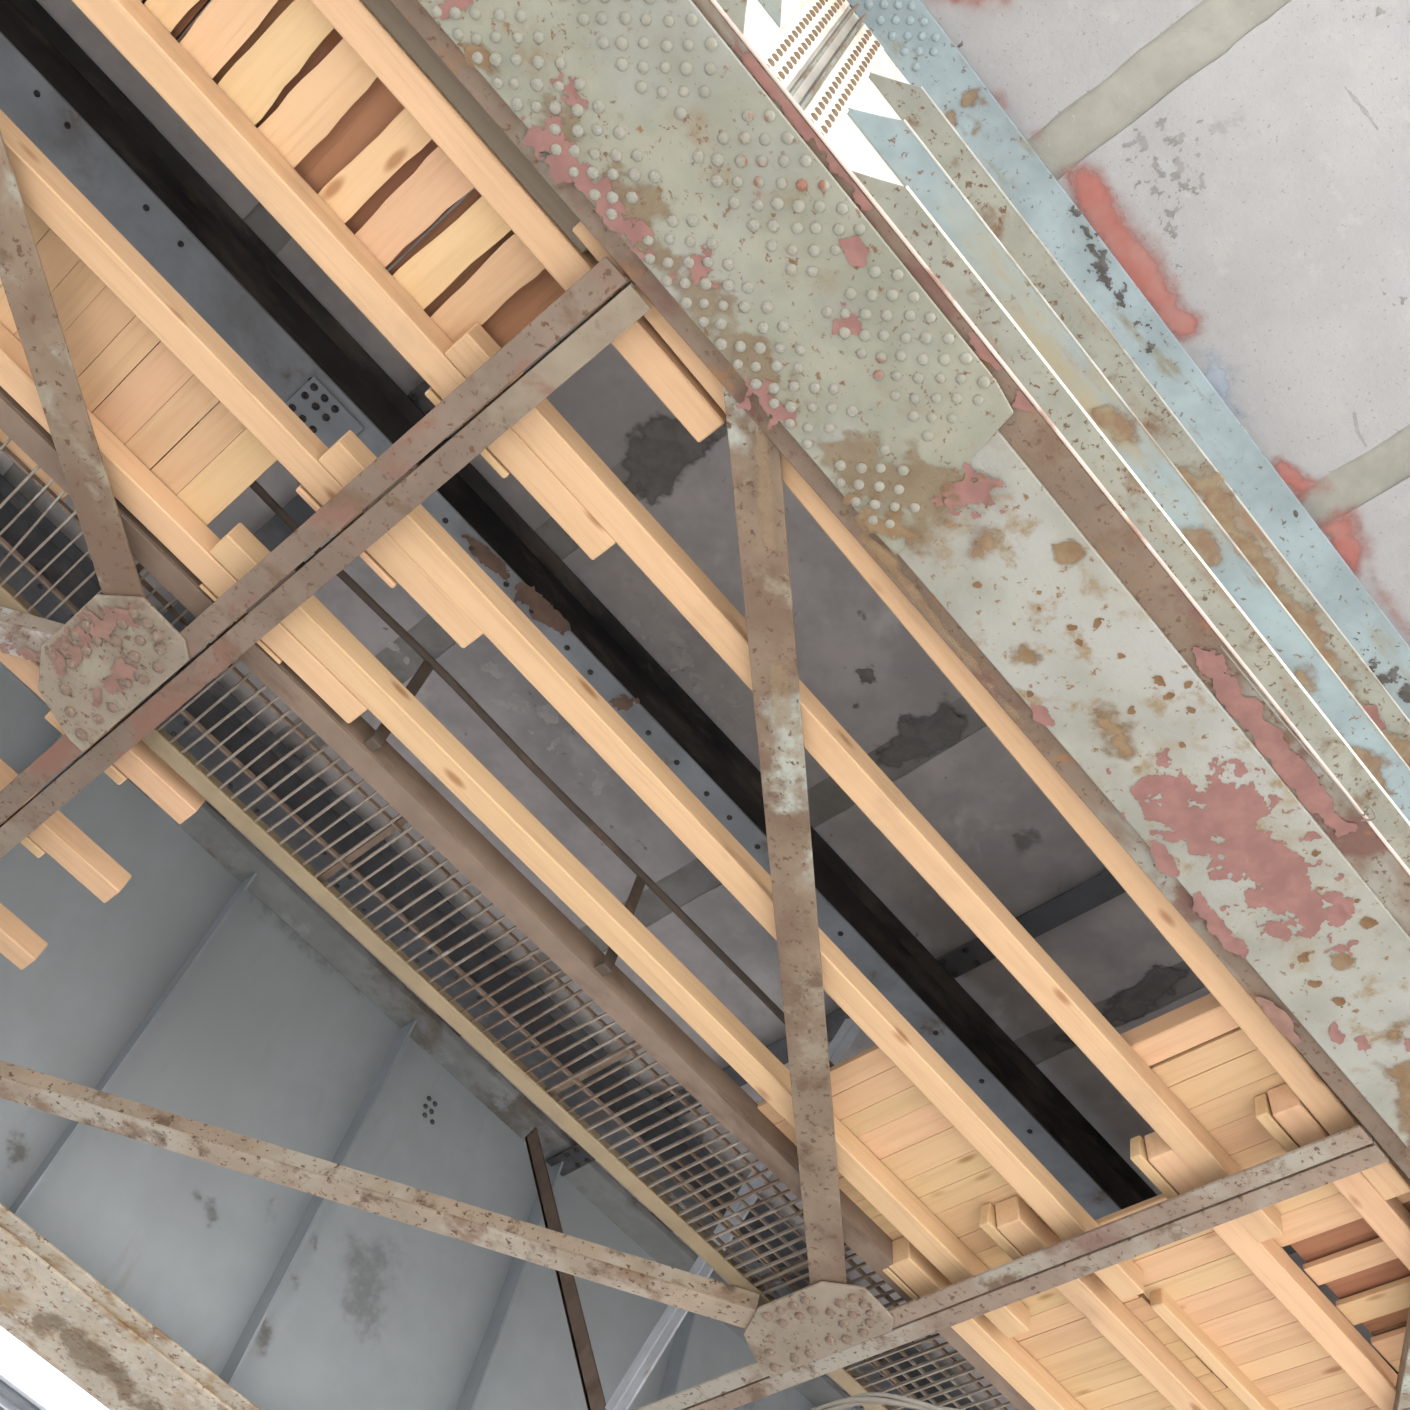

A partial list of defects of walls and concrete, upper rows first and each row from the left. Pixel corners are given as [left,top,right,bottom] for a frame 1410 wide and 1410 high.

peeling [433,0,473,20]
peeling [521,73,655,259]
peeling [669,244,720,289]
rust [1091,406,1139,442]
damp [622,416,727,505]
rust [1177,466,1366,706]
damp [855,669,875,684]
damp [877,703,967,768]
rust [1351,732,1410,795]
peeling [1120,644,1359,960]
damp [1103,965,1187,1024]
peeling [1329,1022,1371,1051]